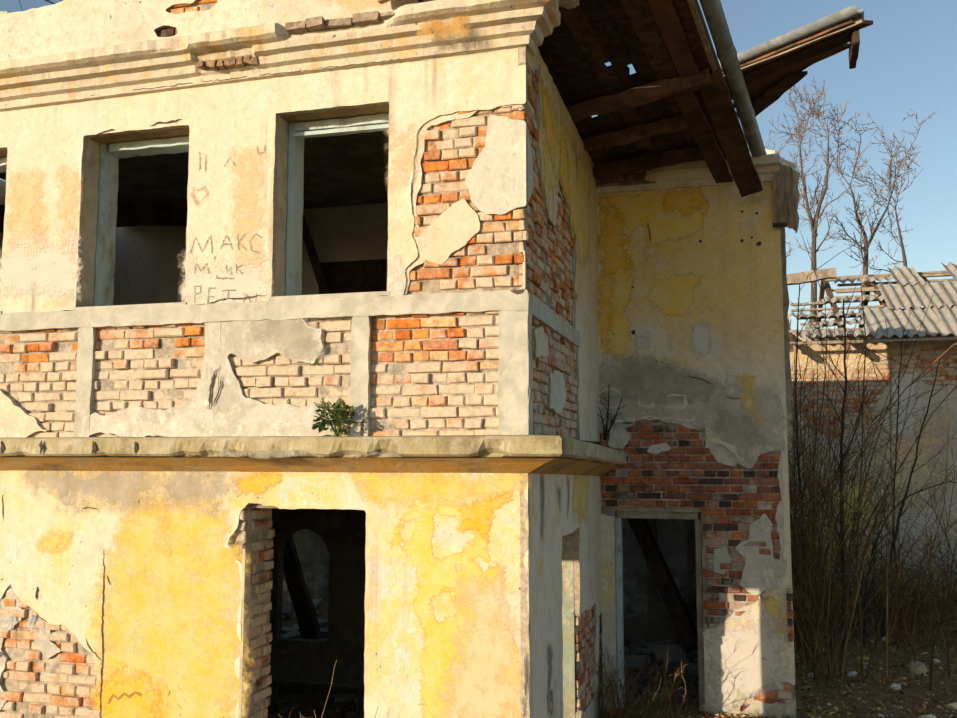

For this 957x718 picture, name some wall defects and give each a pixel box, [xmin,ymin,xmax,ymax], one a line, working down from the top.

flaking render [388,61,657,327]
crack [86,549,111,718]
peeling [0,495,248,718]
peeling [235,472,282,495]
spalling [217,449,324,458]
peeling [352,472,527,718]
flaking render [572,418,795,714]
water stain [597,200,789,462]